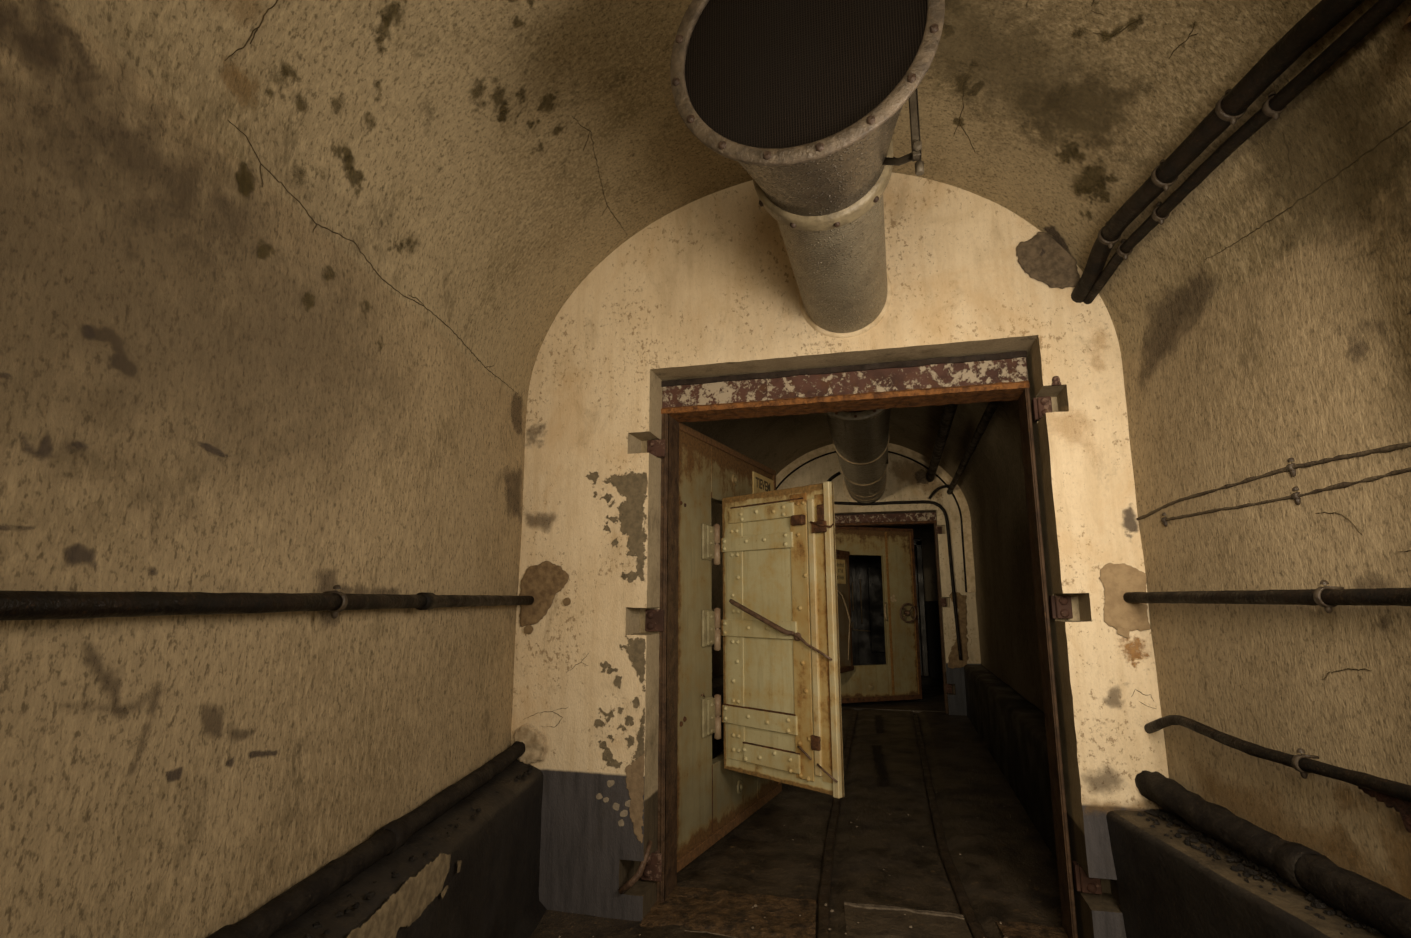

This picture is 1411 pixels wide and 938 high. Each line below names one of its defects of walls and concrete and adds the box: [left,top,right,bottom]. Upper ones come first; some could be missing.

crack [224,0,278,61]
water stain [1055,140,1117,219]
crack [1205,120,1411,260]
crack [228,120,519,395]
peeling [586,468,648,583]
rust [1125,637,1148,667]
peeling [594,636,646,843]
peeling [347,852,462,938]